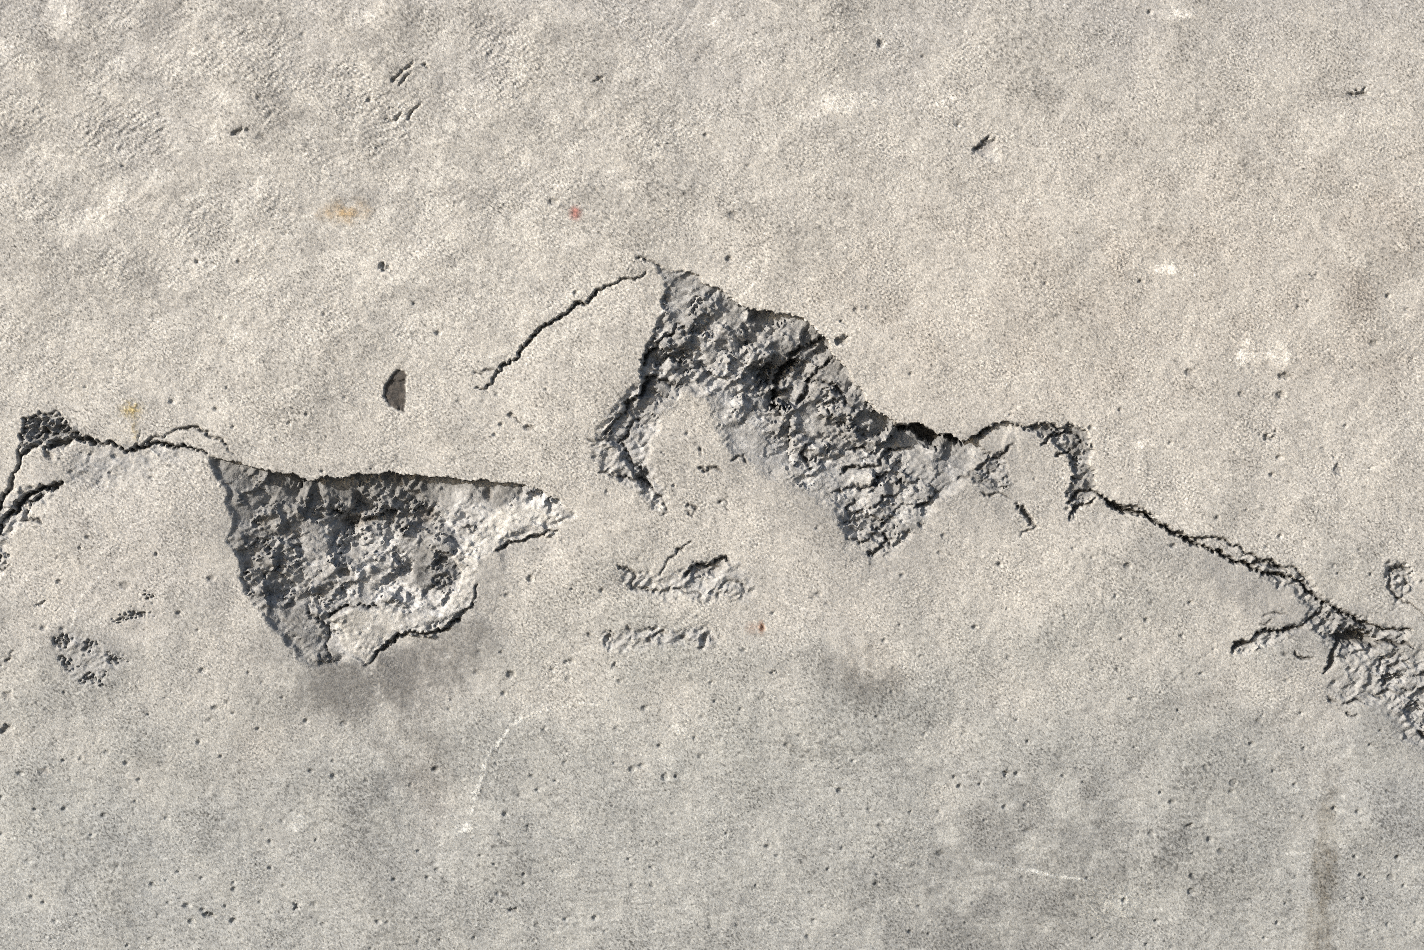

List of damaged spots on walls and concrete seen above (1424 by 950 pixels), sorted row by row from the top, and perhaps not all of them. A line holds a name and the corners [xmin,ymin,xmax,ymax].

crack [473,256,663,392]
crack [0,425,236,574]
spalling [205,453,577,674]
spalling [586,267,1102,569]
crack [1096,491,1414,655]
spalling [1294,611,1424,743]